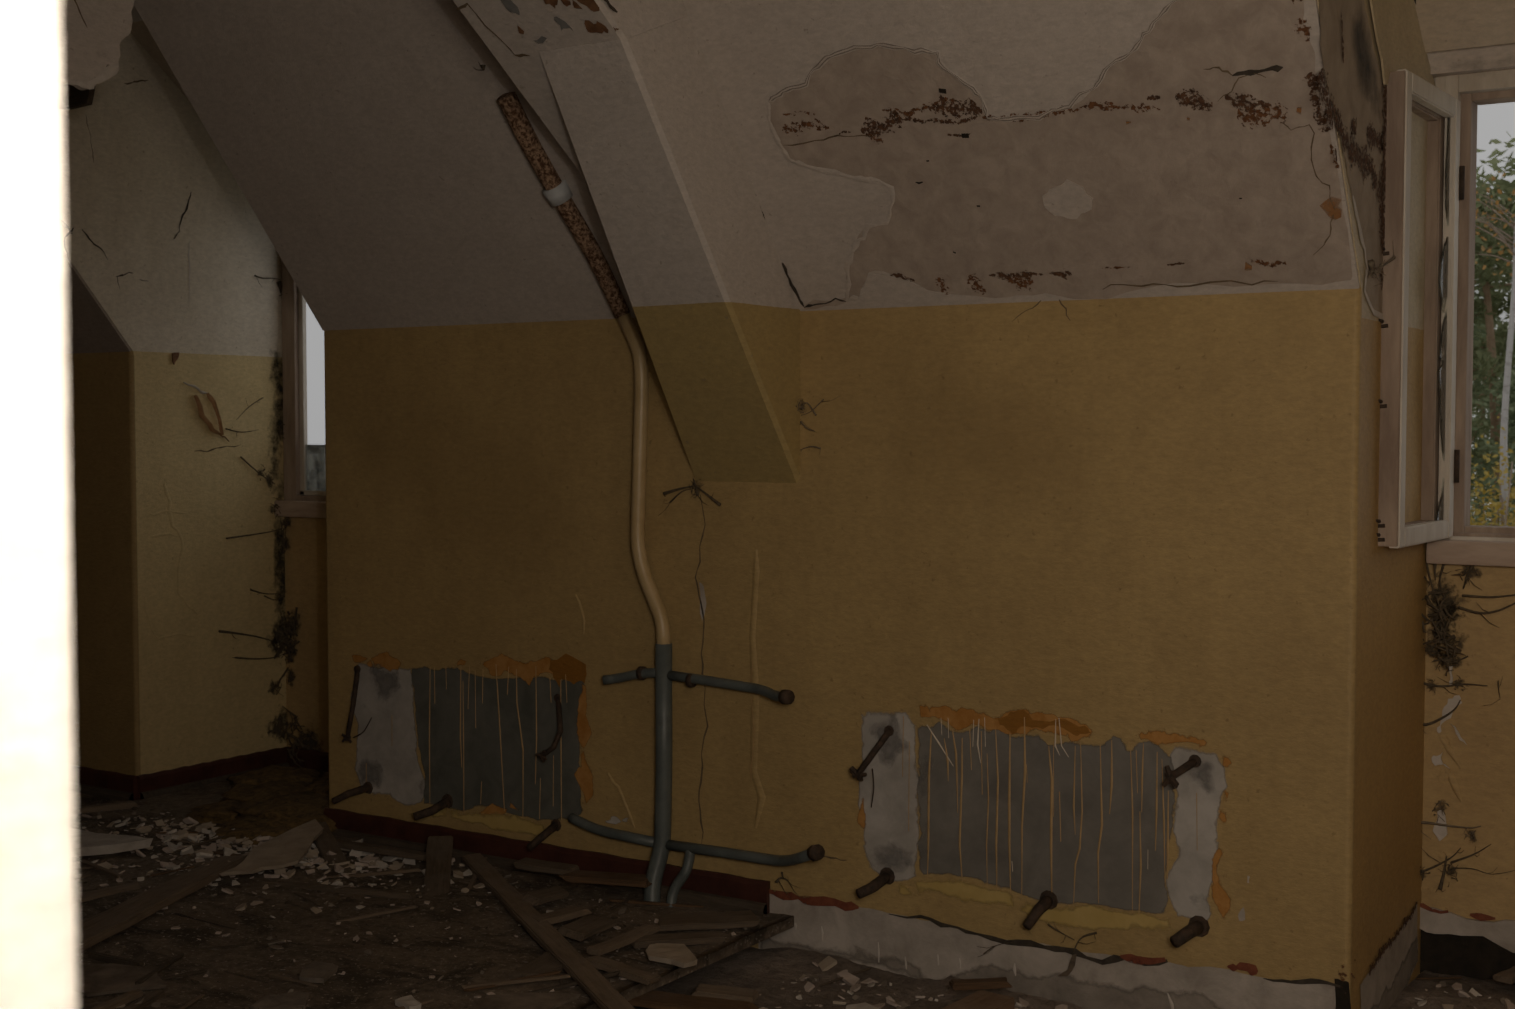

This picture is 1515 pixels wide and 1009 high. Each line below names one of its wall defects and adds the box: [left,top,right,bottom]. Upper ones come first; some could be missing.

peeling [501,0,619,44]
flaking render [765,0,1393,319]
crack [64,222,144,288]
peeling [1431,666,1467,802]
flaking render [758,810,1515,1009]